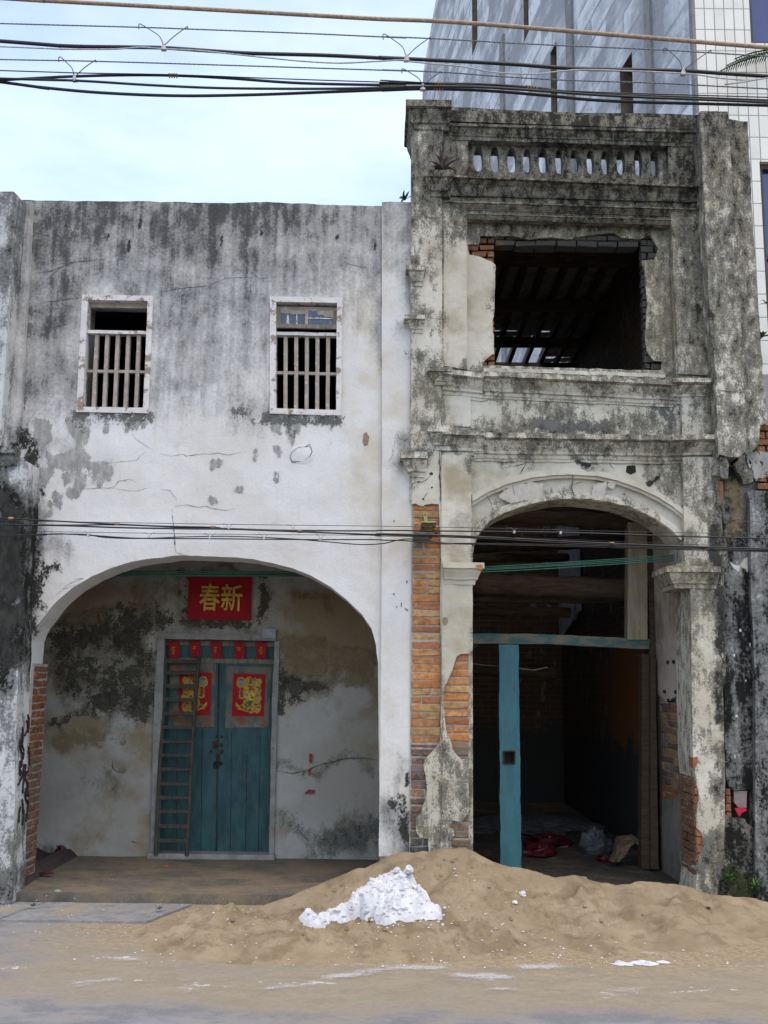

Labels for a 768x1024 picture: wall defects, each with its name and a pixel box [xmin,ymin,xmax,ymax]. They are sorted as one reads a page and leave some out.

damp [210,208,223,267]
damp [14,423,40,467]
crack [86,434,247,556]
peeling [499,481,544,503]
spalling [711,425,768,508]
damp [0,483,177,754]
damp [278,636,376,716]
flaking render [393,498,470,853]
flaking render [24,663,77,887]
crack [279,758,375,776]
flaking render [659,703,703,875]
damp [276,813,379,856]